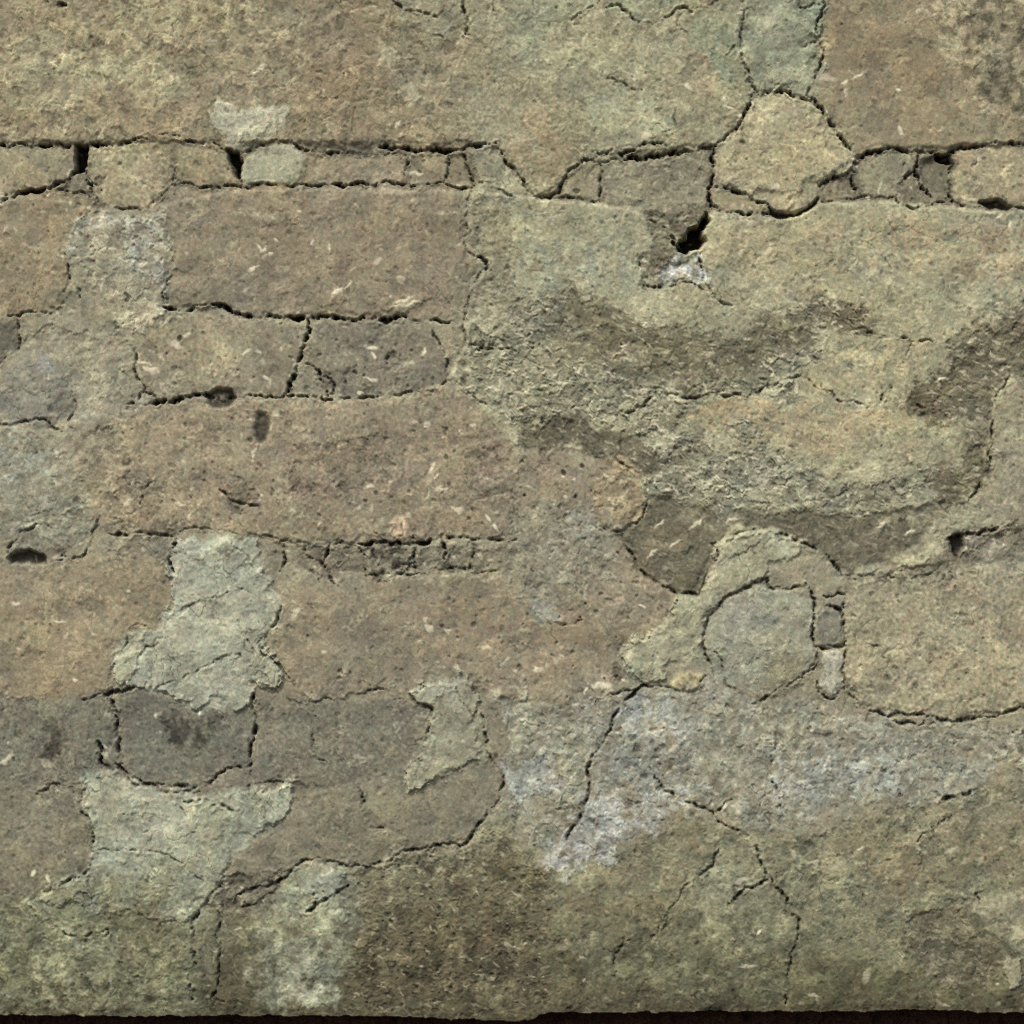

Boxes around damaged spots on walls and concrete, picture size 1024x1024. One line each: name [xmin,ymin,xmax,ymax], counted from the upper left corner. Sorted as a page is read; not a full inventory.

crack [0,0,1024,417]
crack [0,392,79,433]
flaking render [102,531,288,718]
crack [219,489,260,508]
crack [6,516,517,585]
flaking render [401,668,493,796]
crack [550,619,582,627]
spalling [448,200,1024,690]
crack [565,457,1024,843]
flaking render [19,765,578,1017]
crack [612,768,802,1005]
crack [974,889,986,904]